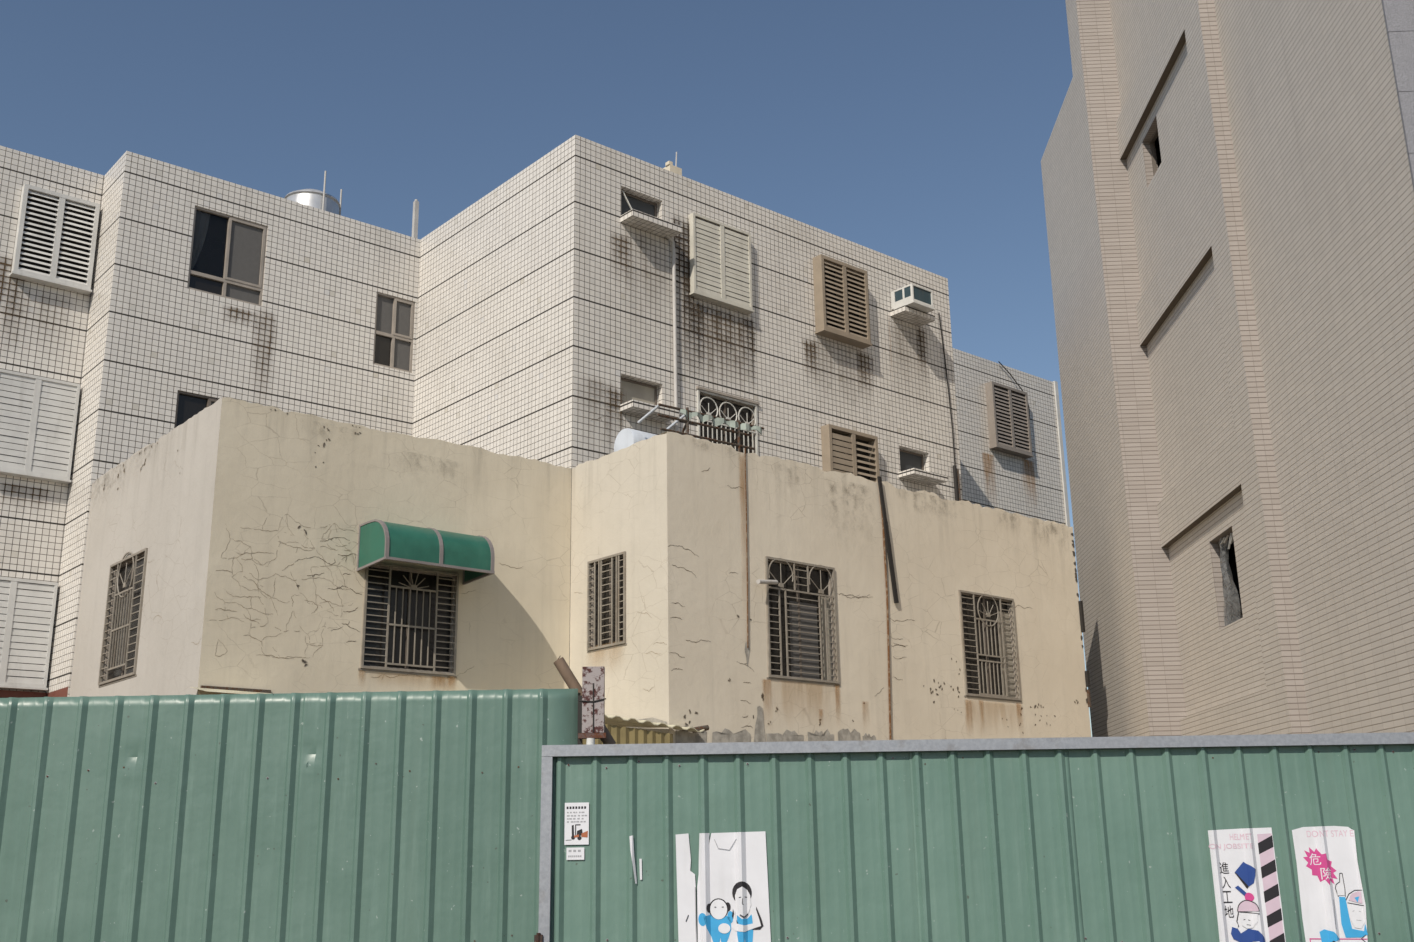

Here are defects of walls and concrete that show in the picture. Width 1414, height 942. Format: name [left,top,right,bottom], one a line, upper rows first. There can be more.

water stain [611,237,656,272]
water stain [673,217,755,376]
water stain [227,306,275,382]
water stain [804,340,873,382]
crack [191,516,364,659]